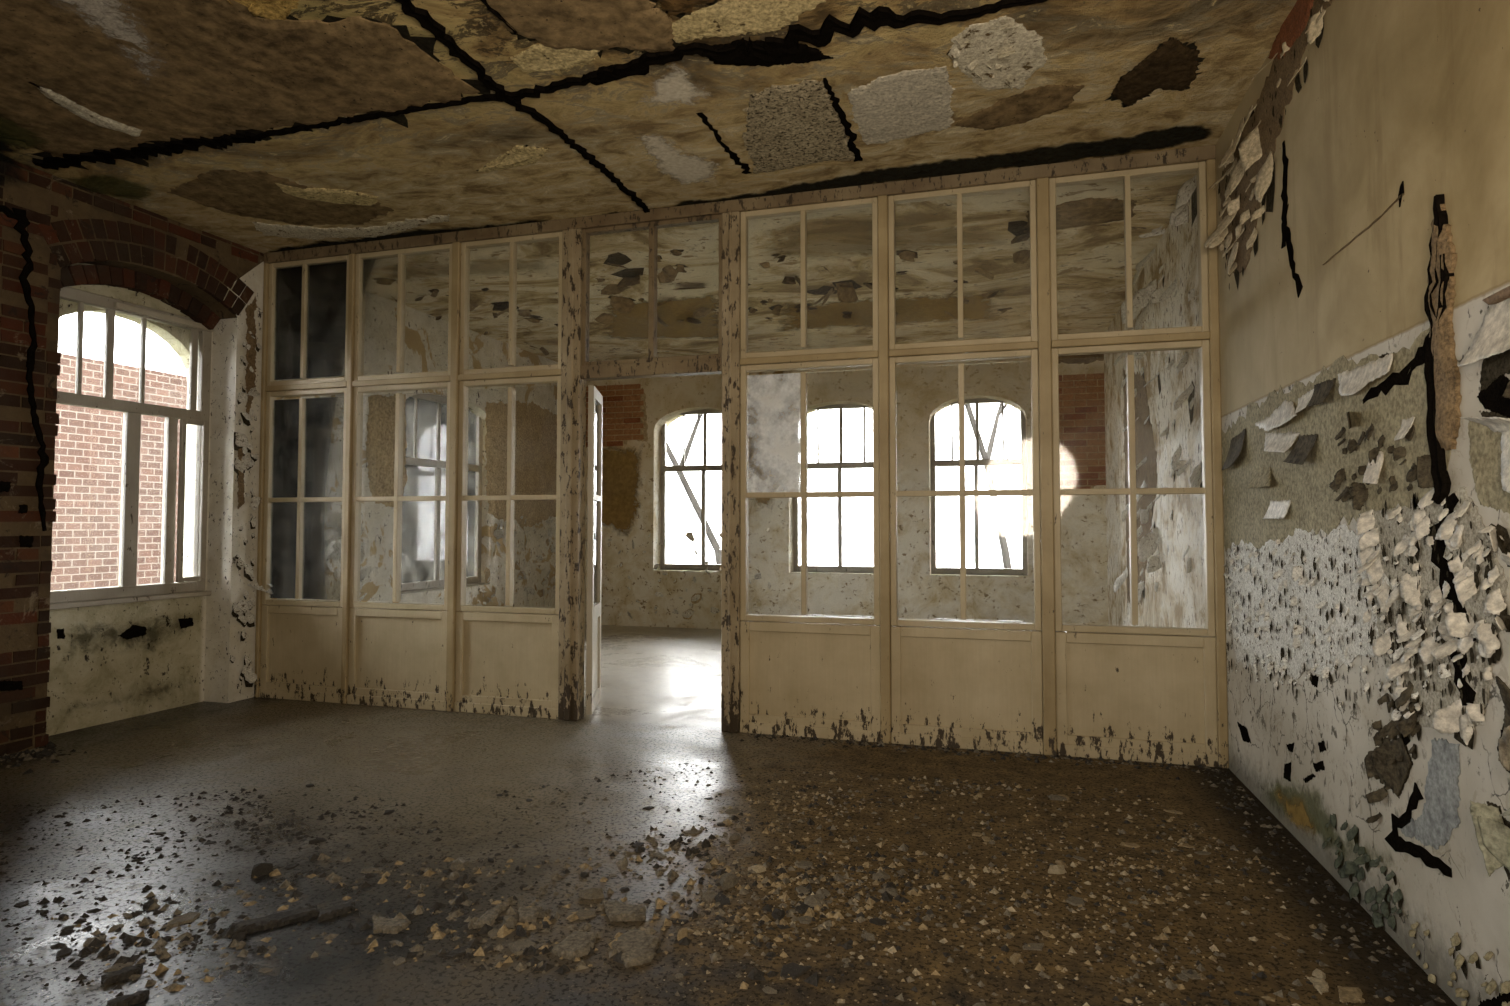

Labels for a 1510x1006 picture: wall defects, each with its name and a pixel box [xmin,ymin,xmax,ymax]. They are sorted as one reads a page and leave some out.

peeling [227,0,299,20]
crack [32,0,1048,213]
spalling [672,0,826,43]
spalling [946,16,1085,130]
spalling [1104,37,1205,108]
spalling [1056,197,1137,230]
peeling [1121,0,1333,330]
crack [0,205,49,531]
peeling [1058,352,1202,605]
spalling [1221,298,1510,882]
peeling [1408,922,1510,1006]